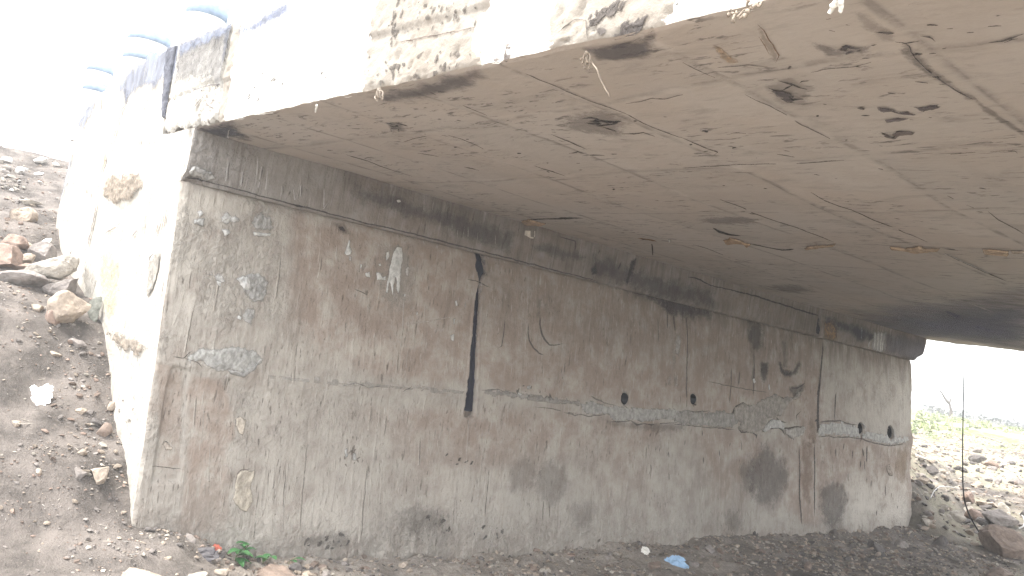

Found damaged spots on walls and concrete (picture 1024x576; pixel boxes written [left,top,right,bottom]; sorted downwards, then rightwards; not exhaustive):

leakage [384,77,470,101]
leakage [593,44,646,60]
crack [527,74,830,168]
crack [878,25,1022,132]
spalling [102,172,142,204]
crack [464,254,510,411]
crack [732,319,836,523]